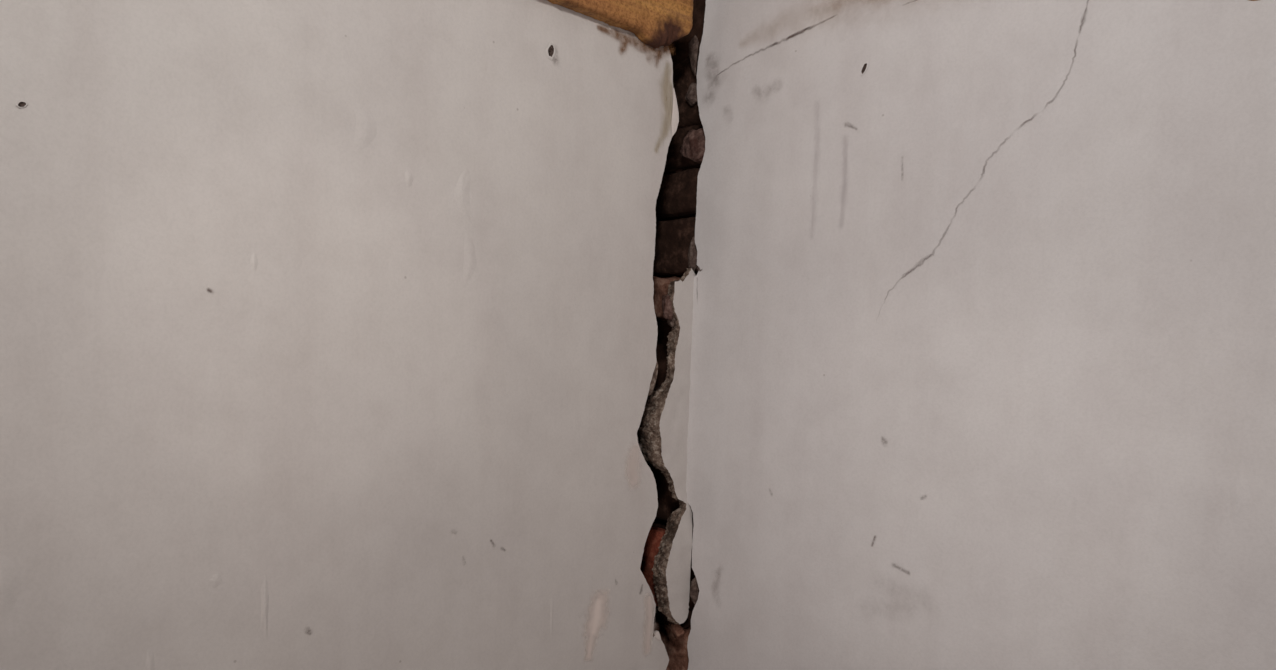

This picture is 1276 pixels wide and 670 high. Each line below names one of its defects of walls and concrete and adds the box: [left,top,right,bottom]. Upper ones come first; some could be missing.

crack [637,35,705,670]